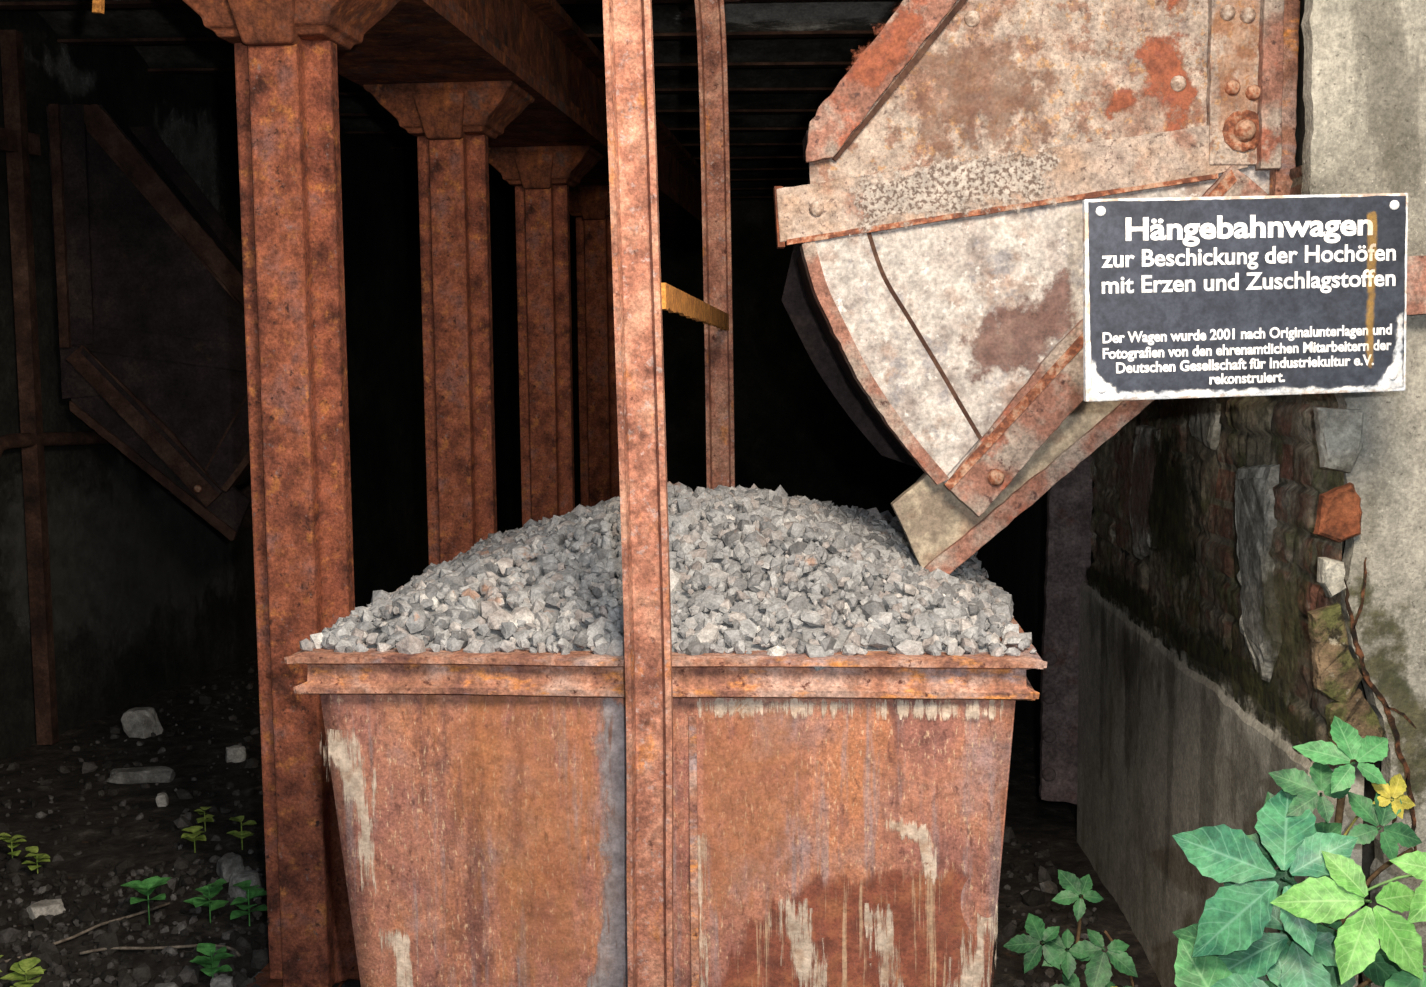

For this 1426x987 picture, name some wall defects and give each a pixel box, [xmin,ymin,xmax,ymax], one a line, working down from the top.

spalling [1289,165,1302,195]
spalling [1085,393,1386,769]